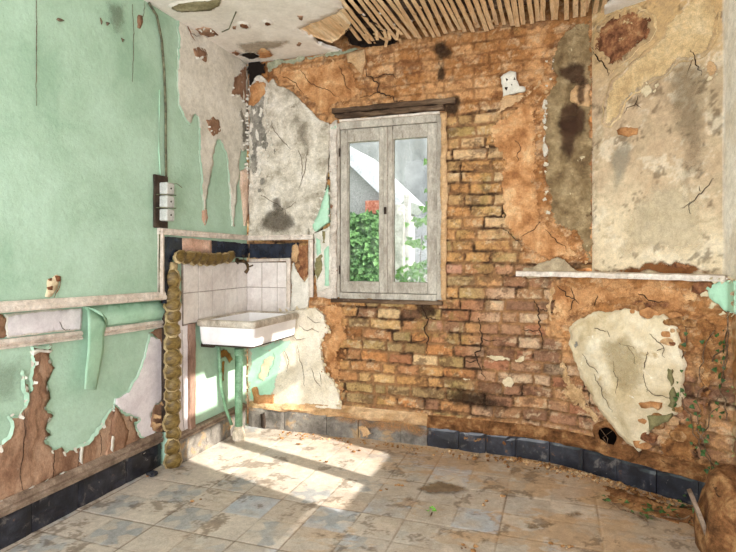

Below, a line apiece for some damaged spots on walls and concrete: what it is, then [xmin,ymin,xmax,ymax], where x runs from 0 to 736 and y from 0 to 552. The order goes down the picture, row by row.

crack [361,73,404,102]
leakage [559,64,587,158]
flaking render [167,0,366,431]
leakage [263,199,293,230]
crack [684,178,714,214]
crack [413,305,436,355]
crack [463,318,497,380]
flaking render [546,276,736,460]
peeling [0,328,164,501]